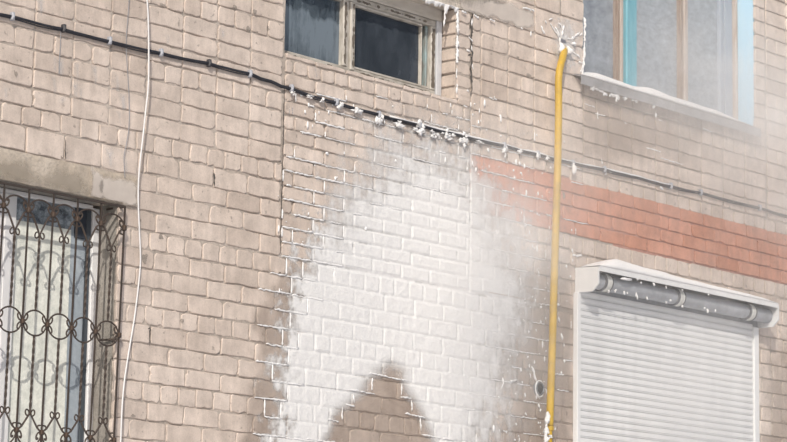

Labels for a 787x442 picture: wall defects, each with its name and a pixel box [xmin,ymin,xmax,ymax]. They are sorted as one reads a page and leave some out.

crack [466,14,474,92]